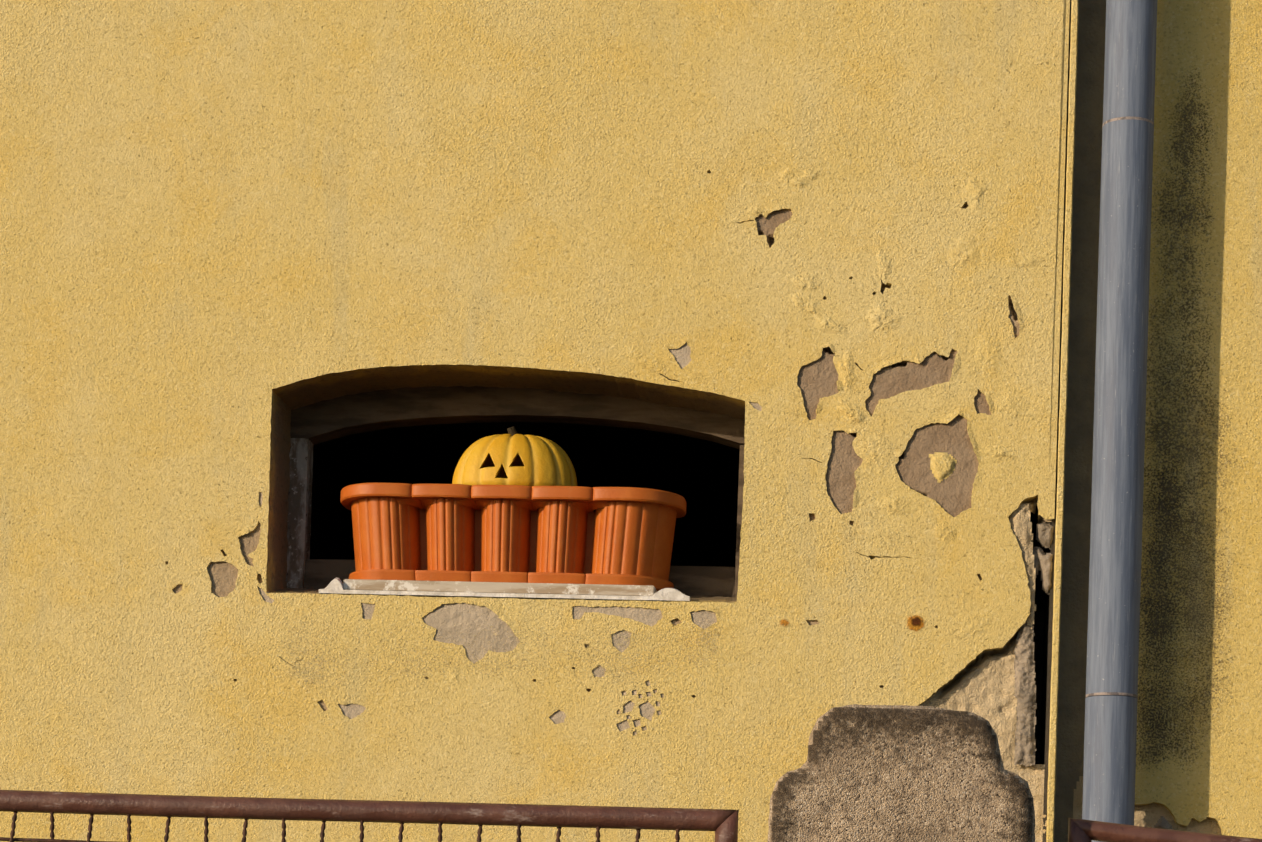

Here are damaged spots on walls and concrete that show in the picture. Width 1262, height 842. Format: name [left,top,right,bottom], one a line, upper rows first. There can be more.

peeling [755,205,793,248]
peeling [797,342,844,420]
peeling [825,427,866,526]
peeling [865,349,961,416]
peeling [894,390,995,517]
leakage [1136,69,1233,767]
peeling [208,522,274,603]
peeling [572,603,721,653]
corrosion [907,616,924,631]
flaking render [920,497,1052,842]
crack [1030,503,1054,764]
leakage [771,707,1033,842]